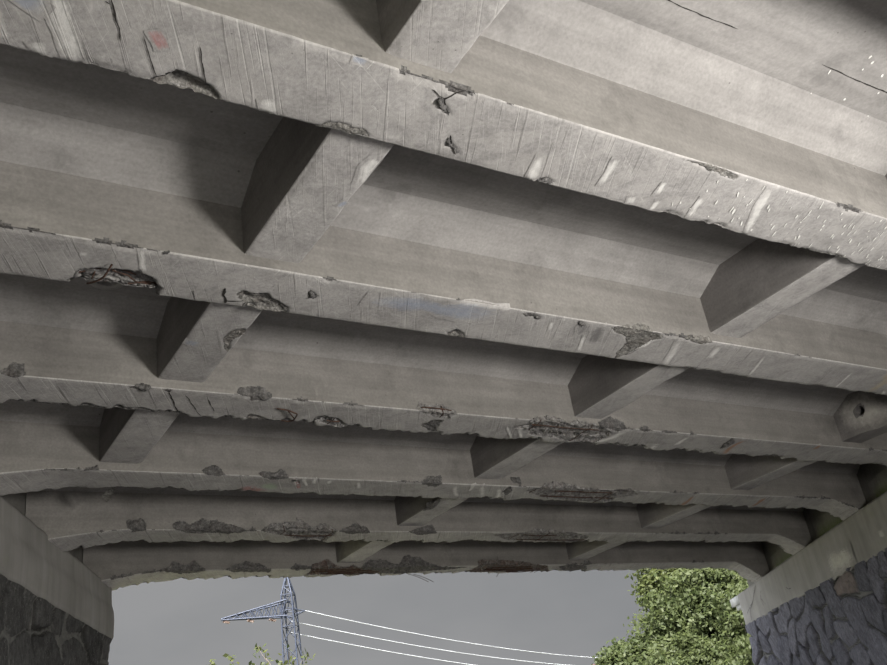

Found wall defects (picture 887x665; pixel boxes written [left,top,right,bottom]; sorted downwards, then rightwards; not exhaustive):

crack [105,0,121,40]
crack [668,0,737,29]
spalling [151,69,218,99]
crack [824,65,887,93]
spalling [68,264,161,295]
spalling [237,291,289,313]
spalling [612,323,663,358]
spalling [512,416,627,443]
spalling [502,477,637,503]
spalling [173,518,250,534]
spalling [264,517,370,541]
spalling [290,555,587,582]